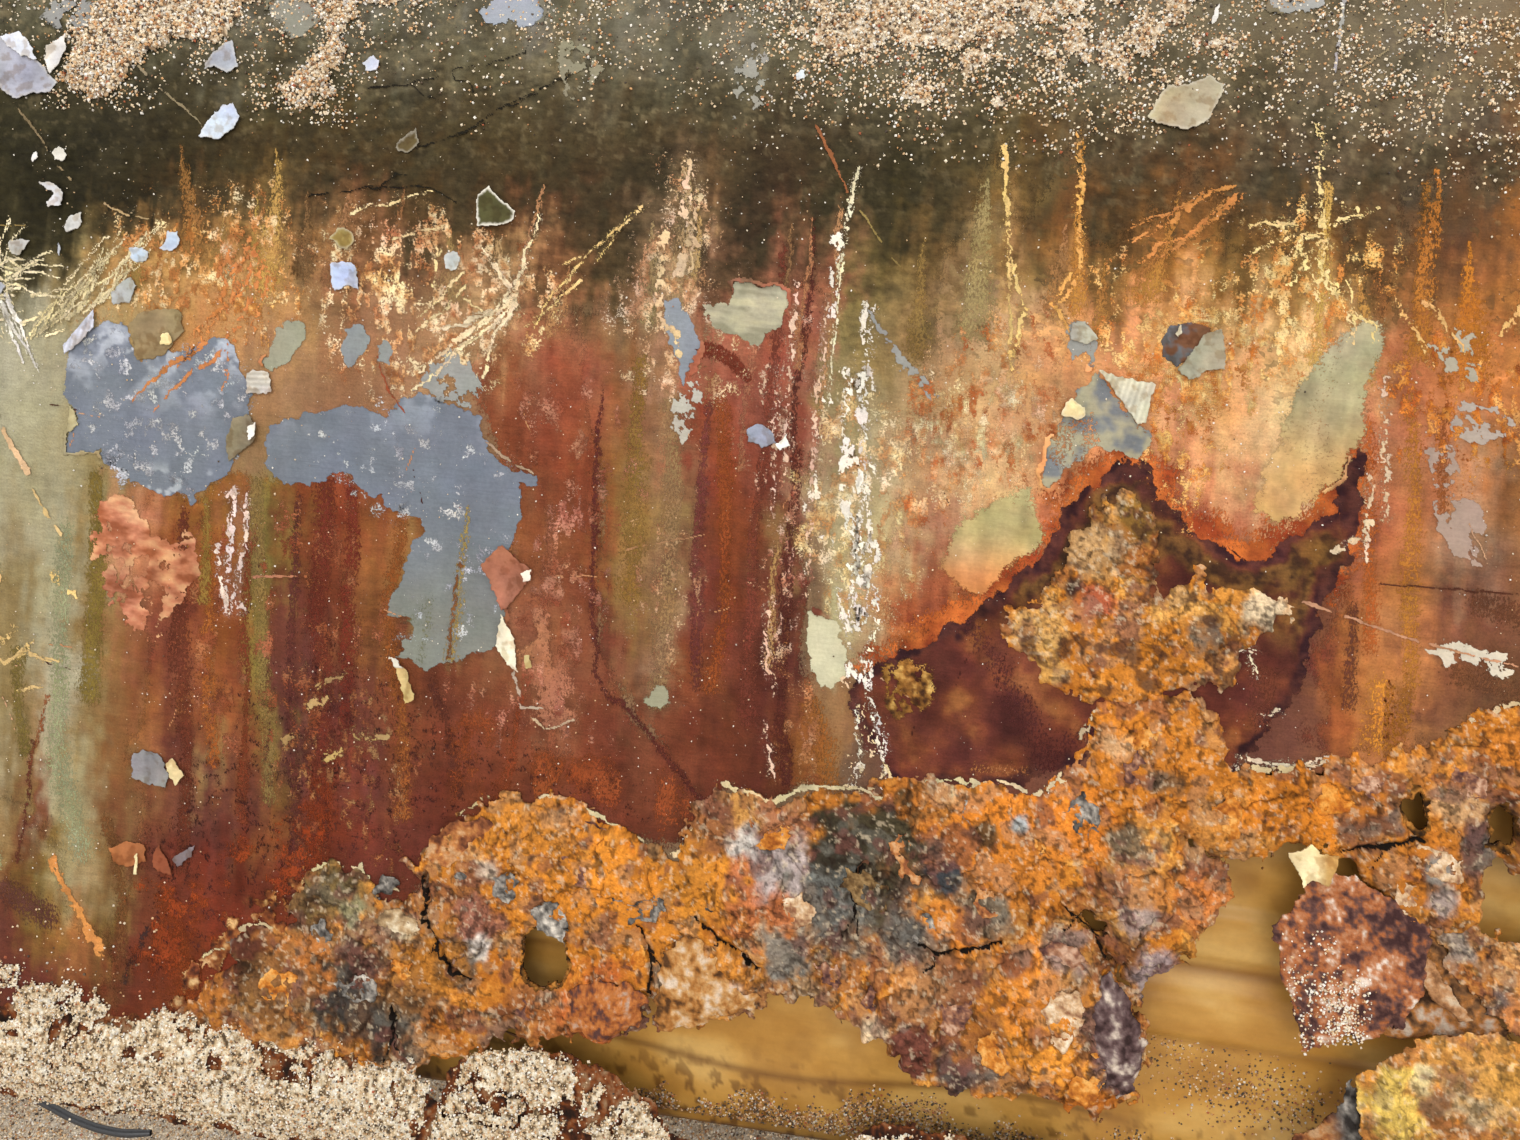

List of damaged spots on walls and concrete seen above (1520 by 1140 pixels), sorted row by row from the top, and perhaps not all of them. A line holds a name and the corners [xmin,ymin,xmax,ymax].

peeling [0,0,93,99]
peeling [39,181,82,255]
corrosion [177,145,228,272]
corrosion [240,149,356,304]
peeling [62,227,538,703]
leakage [0,123,1520,792]
peeling [937,321,1156,597]
corrosion [844,123,1520,1008]
corrosion [0,214,1153,1123]
crack [419,875,472,981]
crack [694,916,760,969]
crack [917,940,1002,973]